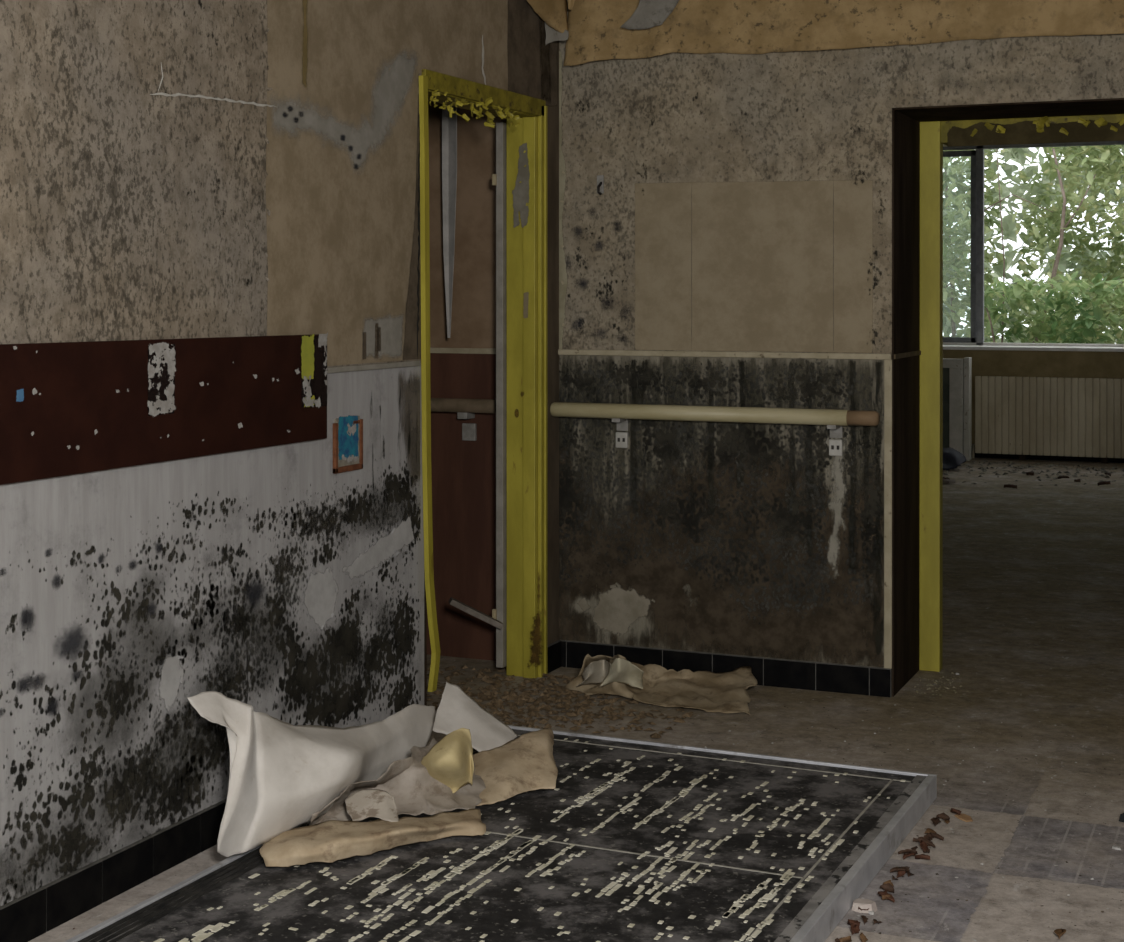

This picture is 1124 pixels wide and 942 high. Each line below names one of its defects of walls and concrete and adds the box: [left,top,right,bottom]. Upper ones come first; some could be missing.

water stain [0,376,421,907]
flaking render [577,582,655,636]
water stain [559,357,884,668]